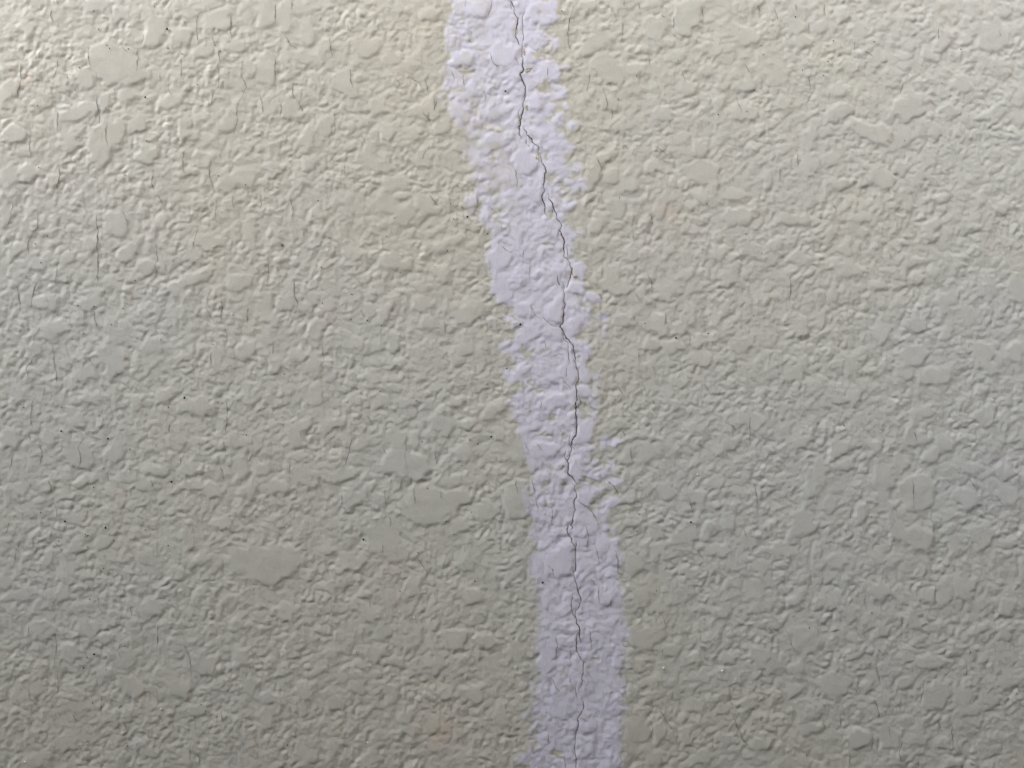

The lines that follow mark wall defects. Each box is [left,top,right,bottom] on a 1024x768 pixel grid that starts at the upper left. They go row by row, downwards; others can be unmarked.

crack [465,0,622,768]